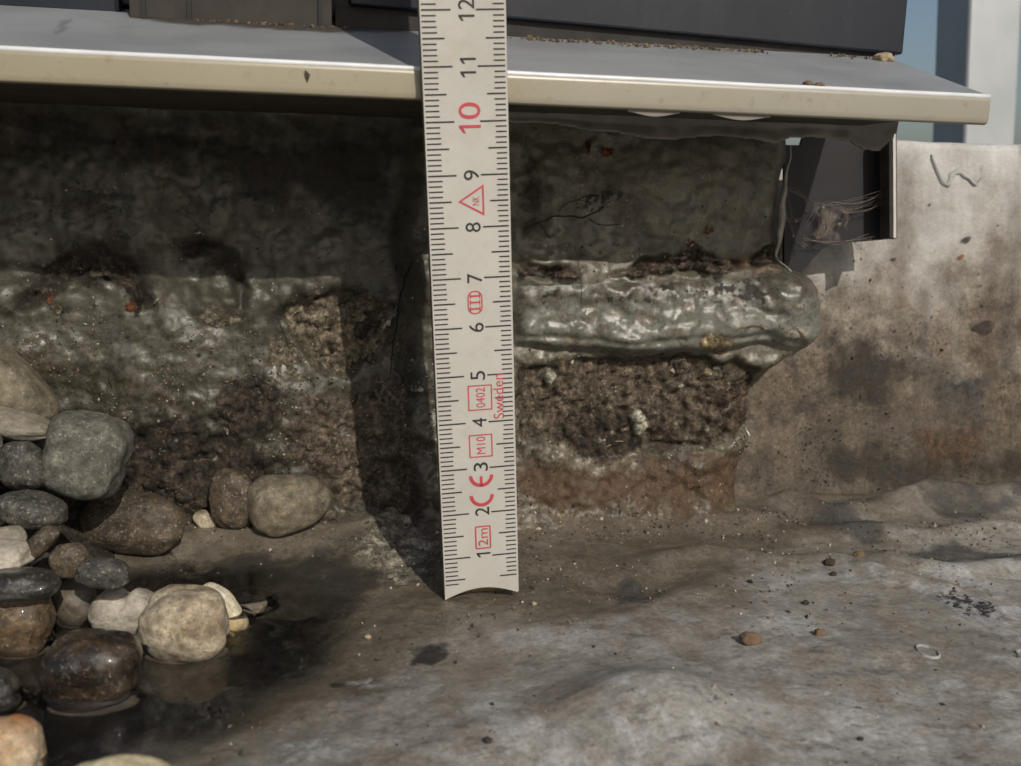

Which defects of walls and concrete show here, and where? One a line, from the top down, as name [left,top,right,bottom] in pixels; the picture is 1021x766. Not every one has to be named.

peeling [508,111,899,151]
spalling [519,261,584,279]
spalling [623,243,777,277]
spalling [516,333,757,459]
damp [829,338,896,402]
damp [193,550,376,635]